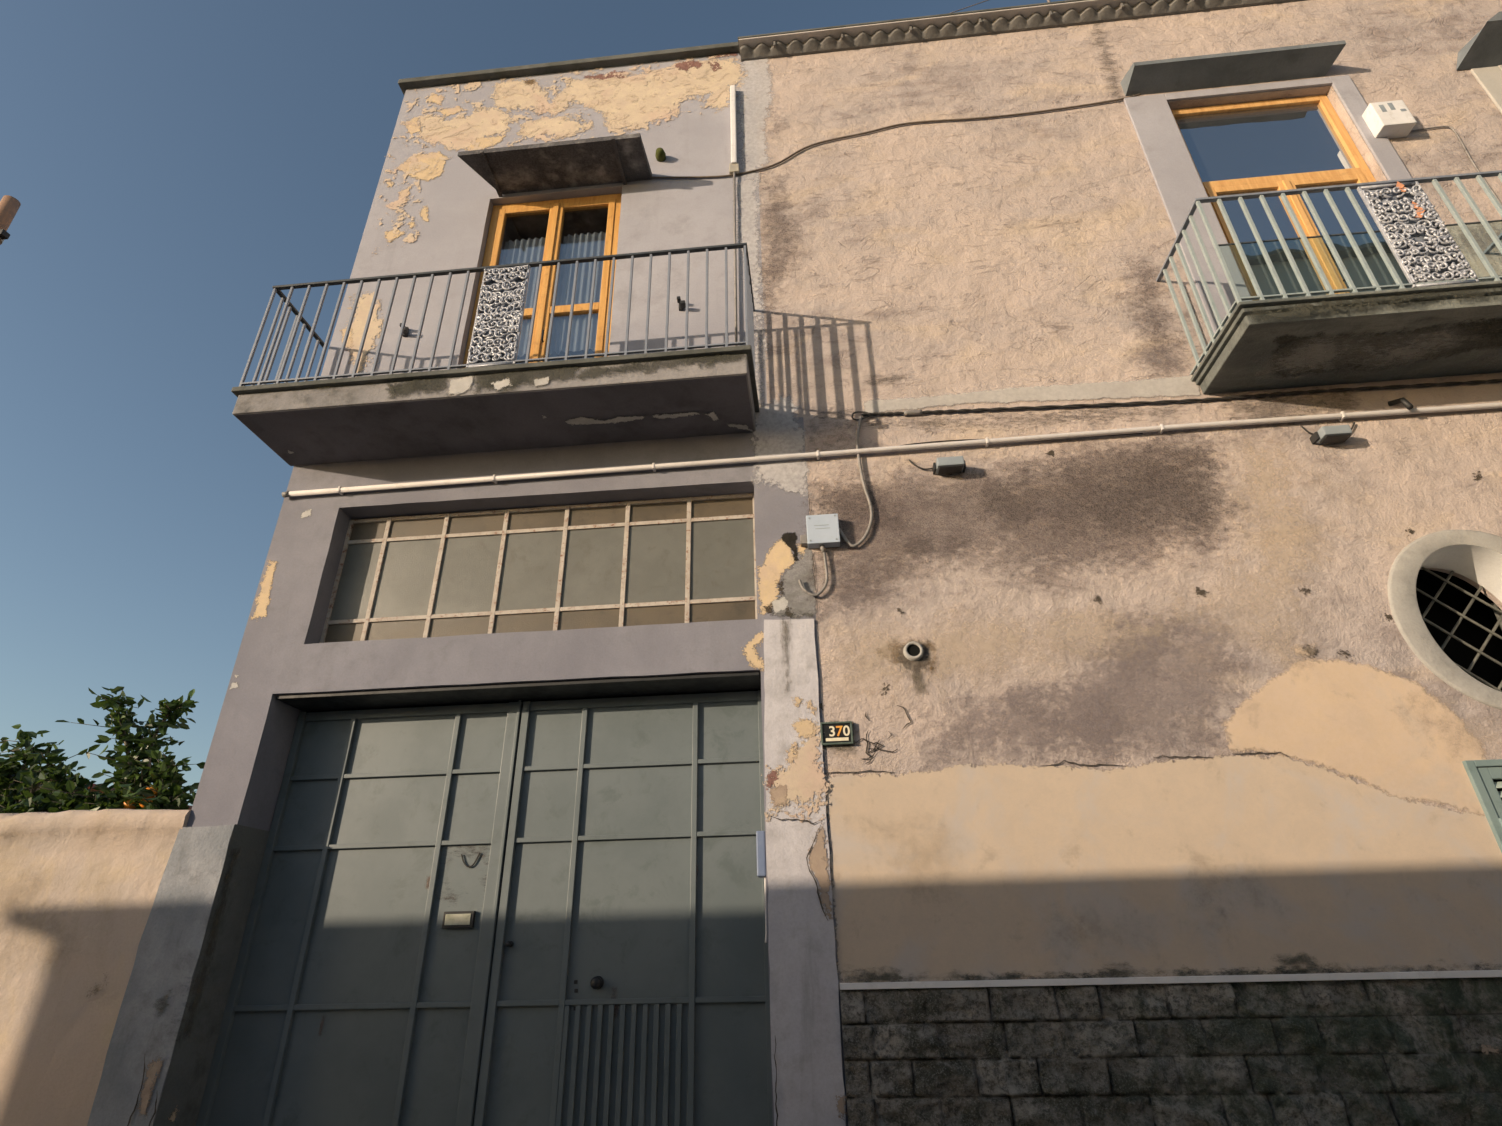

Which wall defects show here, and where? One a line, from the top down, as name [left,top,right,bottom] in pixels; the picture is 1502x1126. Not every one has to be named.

peeling [372,54,774,405]
flaking render [741,532,818,671]
peeling [760,697,833,919]
damp [808,434,1240,616]
damp [853,612,1247,754]
crack [1042,752,1290,767]